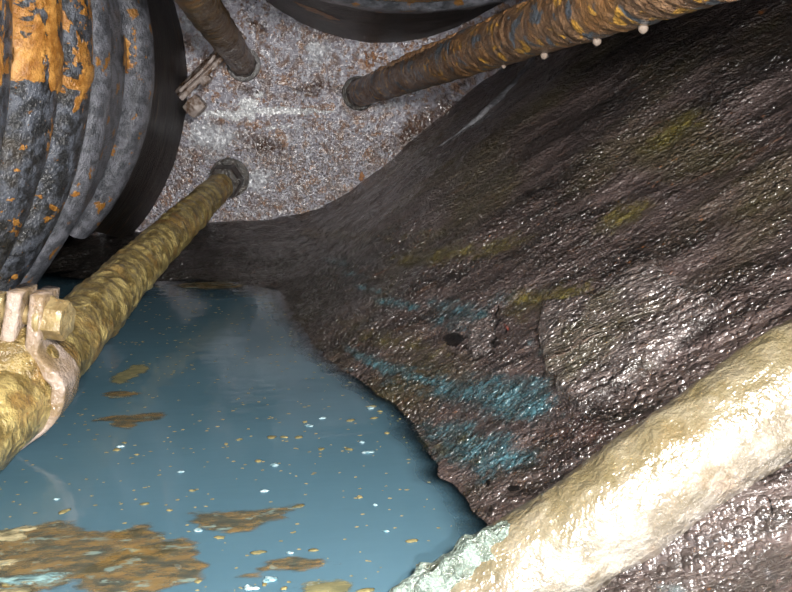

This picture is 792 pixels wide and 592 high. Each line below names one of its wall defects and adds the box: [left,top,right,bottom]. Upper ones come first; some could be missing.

corrosion [362,32,457,78]
corrosion [394,94,456,146]